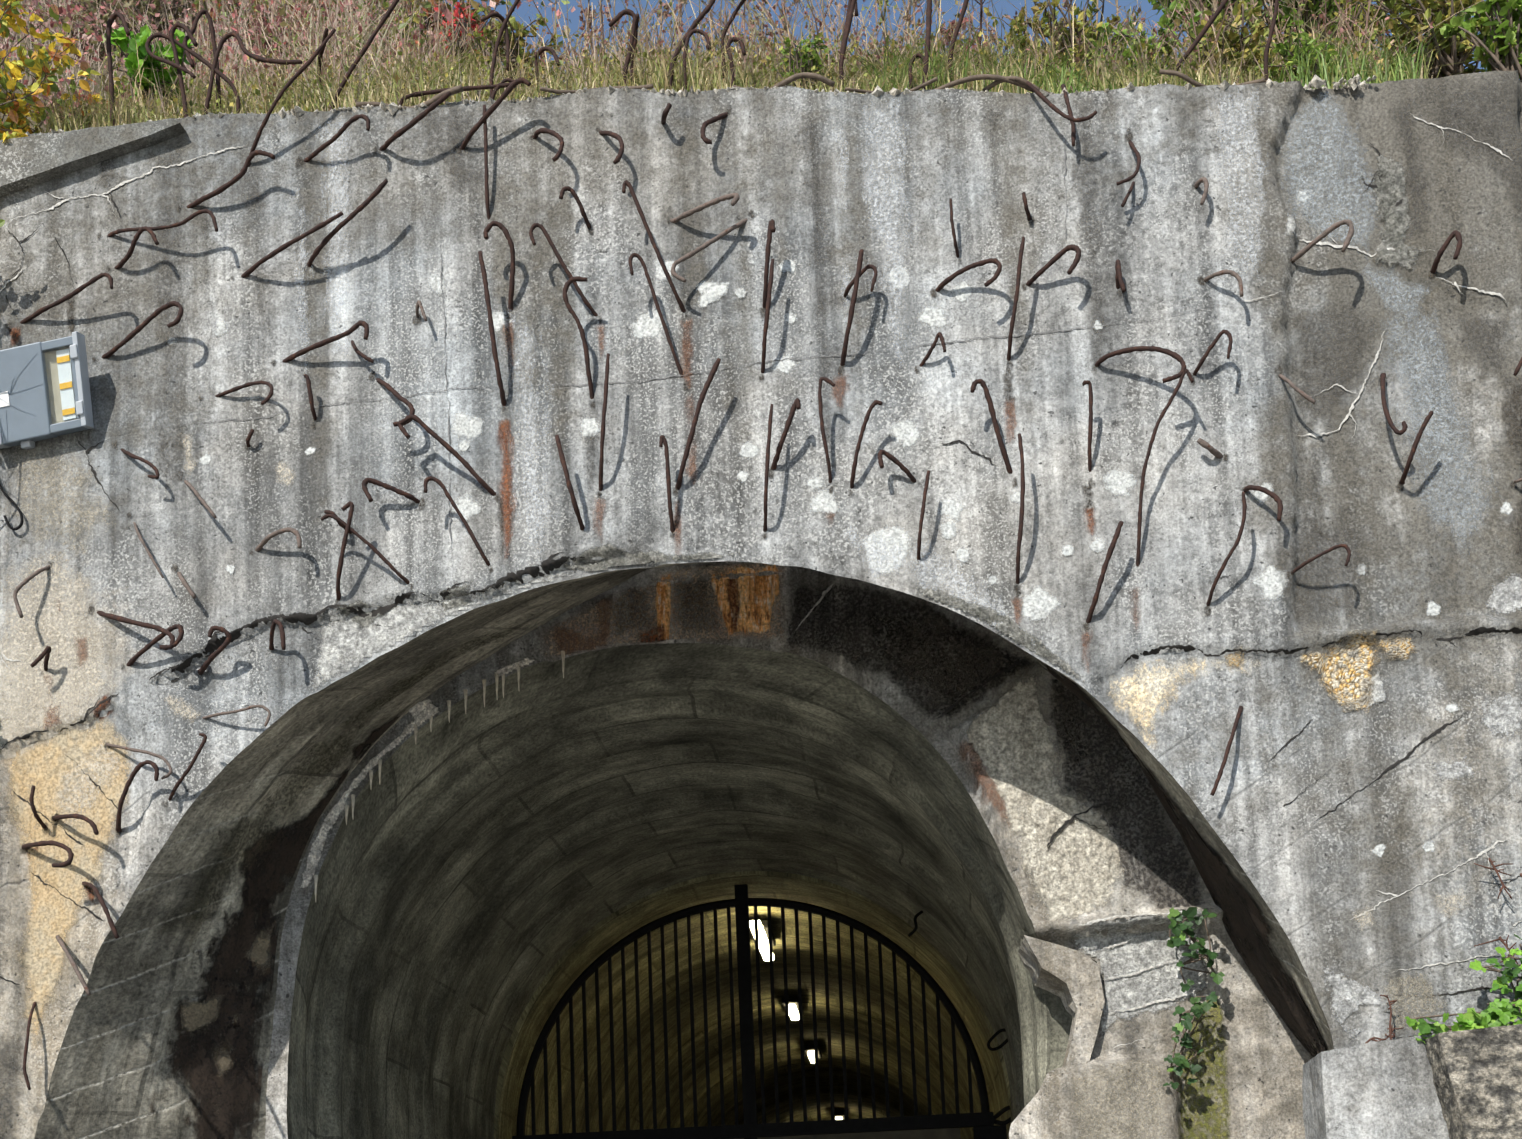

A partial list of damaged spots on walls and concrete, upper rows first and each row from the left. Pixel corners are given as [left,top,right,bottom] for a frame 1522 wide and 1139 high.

crack [0,145,247,317]
crack [1290,230,1508,304]
rust [498,421,516,556]
crack [0,231,1278,849]
rust [640,574,671,643]
rust [712,565,779,635]
crack [1098,627,1522,680]
spalling [1300,631,1414,712]
spalling [0,452,271,1090]
damp [150,619,529,1139]
damp [495,563,1327,1057]
spalling [966,675,1206,1037]